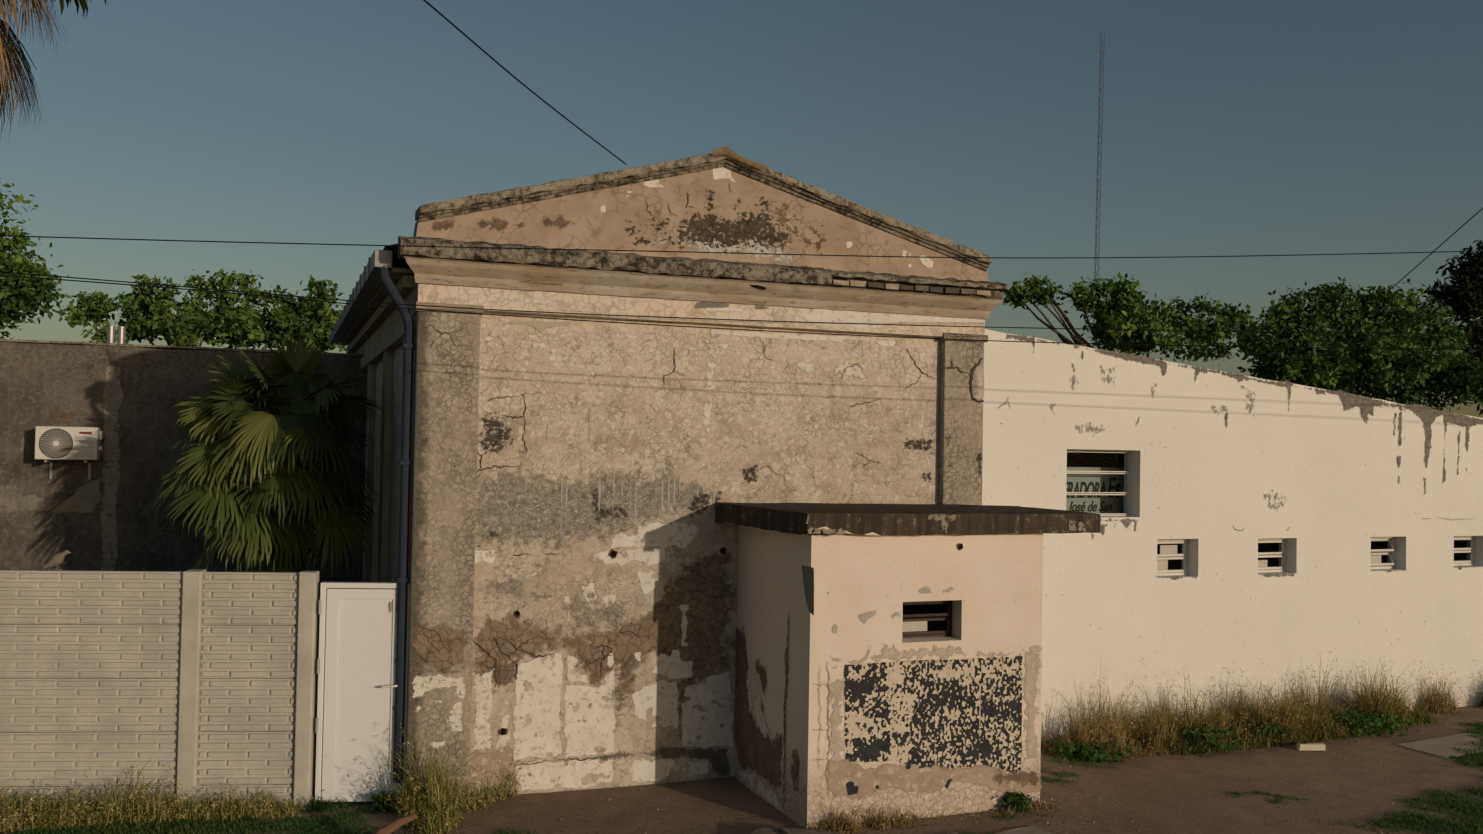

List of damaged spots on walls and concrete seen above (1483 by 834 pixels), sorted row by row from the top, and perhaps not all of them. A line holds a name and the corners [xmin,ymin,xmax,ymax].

water stain [478,413,514,453]
water stain [743,463,760,483]
water stain [475,462,722,554]
peeling [475,550,495,563]
peeling [594,522,697,594]
peeling [564,583,617,622]
peeling [859,596,900,623]
peeling [412,604,770,791]
peeling [827,645,1043,788]
peeling [846,781,879,795]